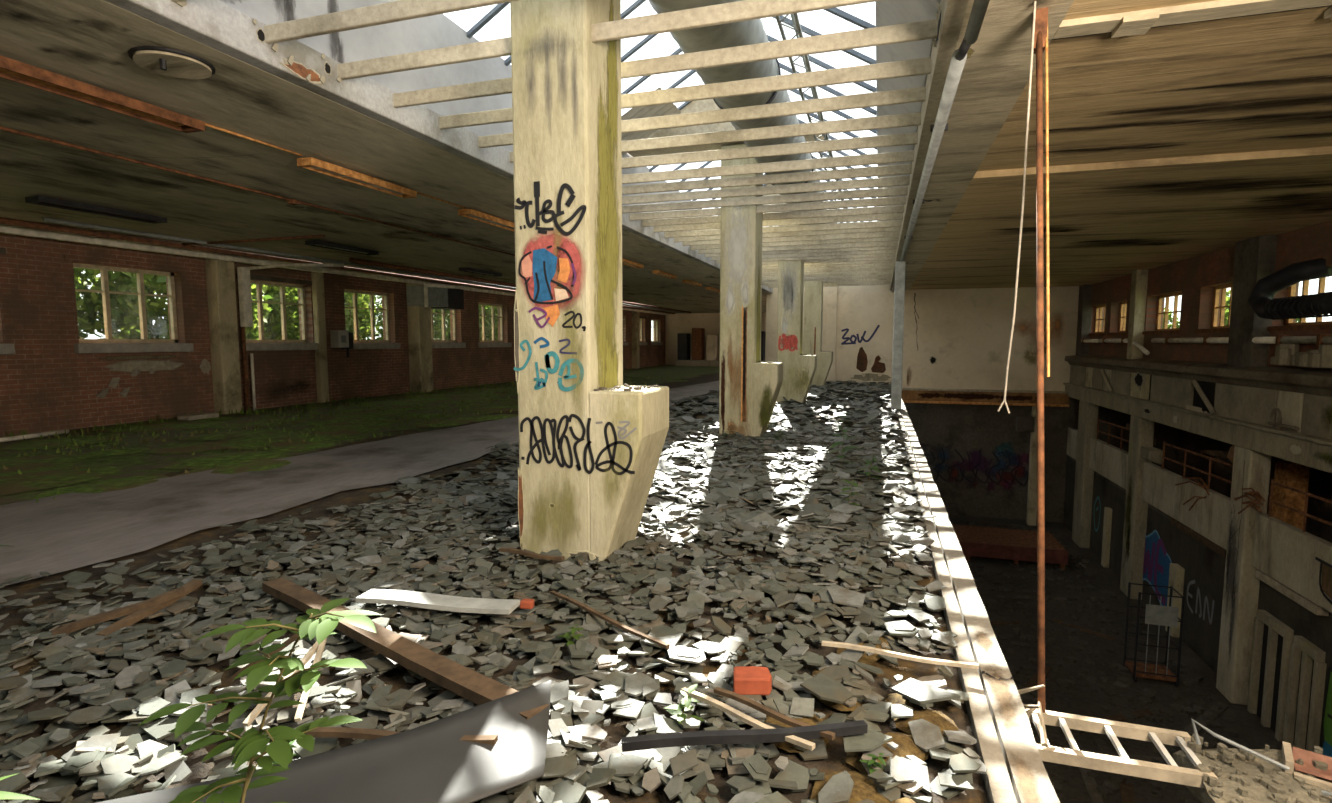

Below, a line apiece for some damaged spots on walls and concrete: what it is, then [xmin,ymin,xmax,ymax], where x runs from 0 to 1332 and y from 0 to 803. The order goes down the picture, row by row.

water stain [277,0,295,21]
water stain [332,32,343,64]
water stain [1035,76,1332,140]
water stain [598,40,618,271]
water stain [1045,143,1177,153]
water stain [1115,175,1332,214]
water stain [1001,226,1175,247]
water stain [604,332,618,388]